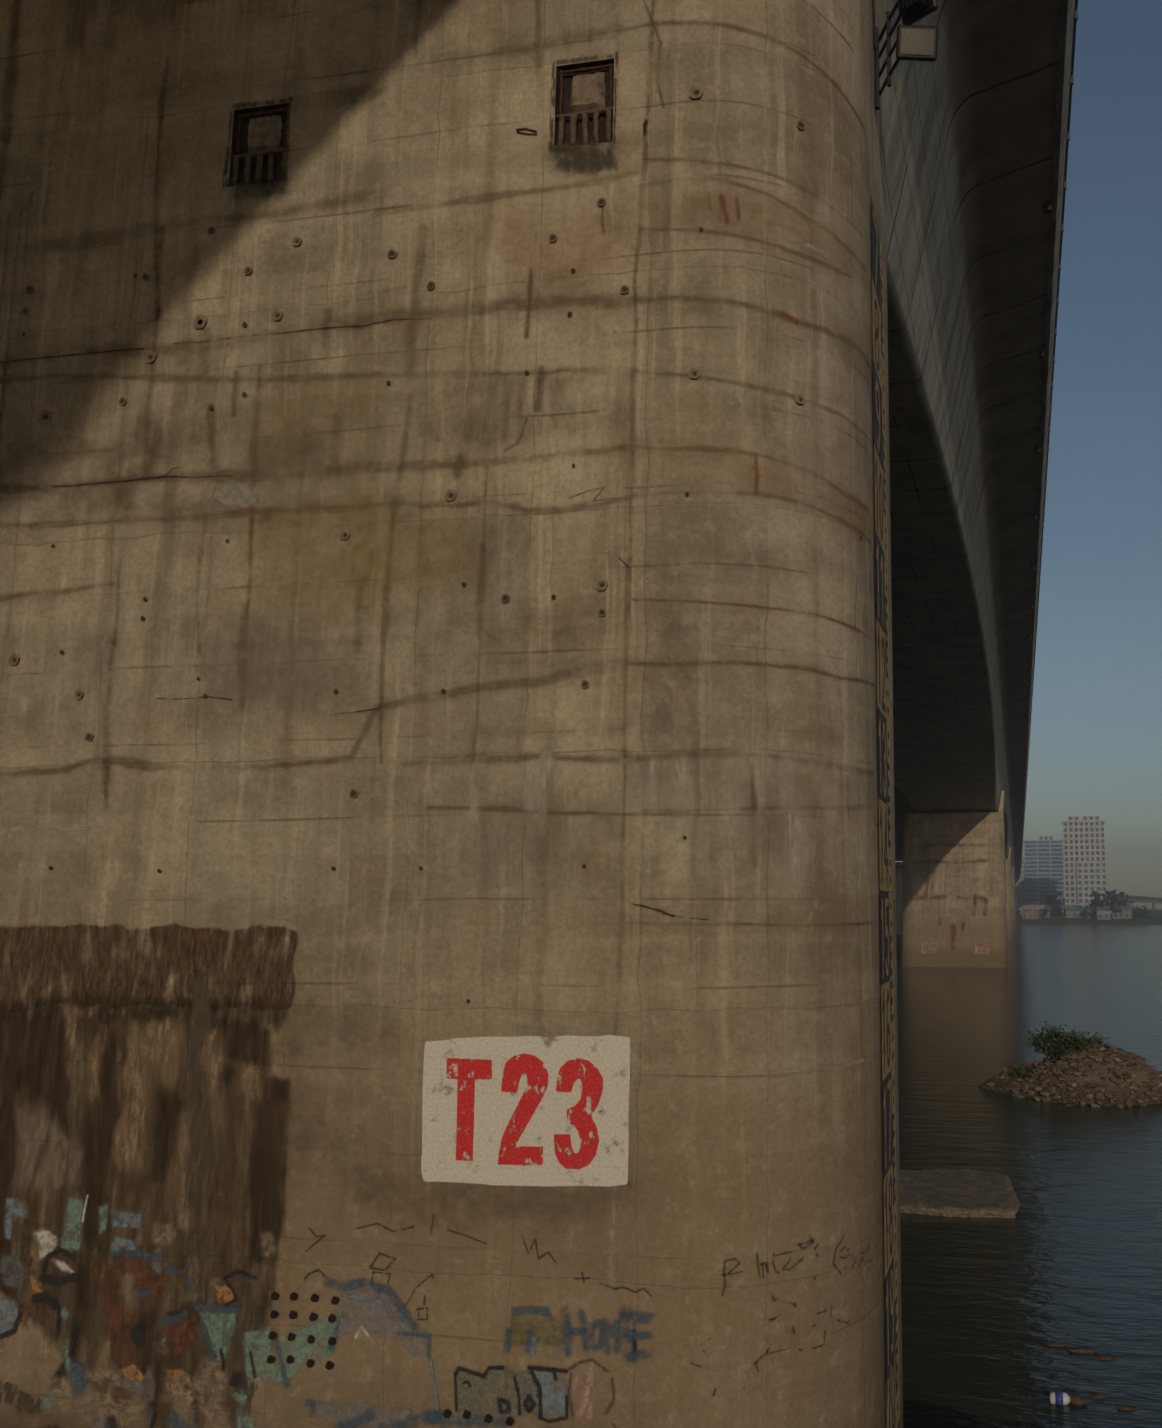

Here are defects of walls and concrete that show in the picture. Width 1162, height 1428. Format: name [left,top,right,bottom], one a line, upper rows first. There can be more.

leakage [496,284,613,338]